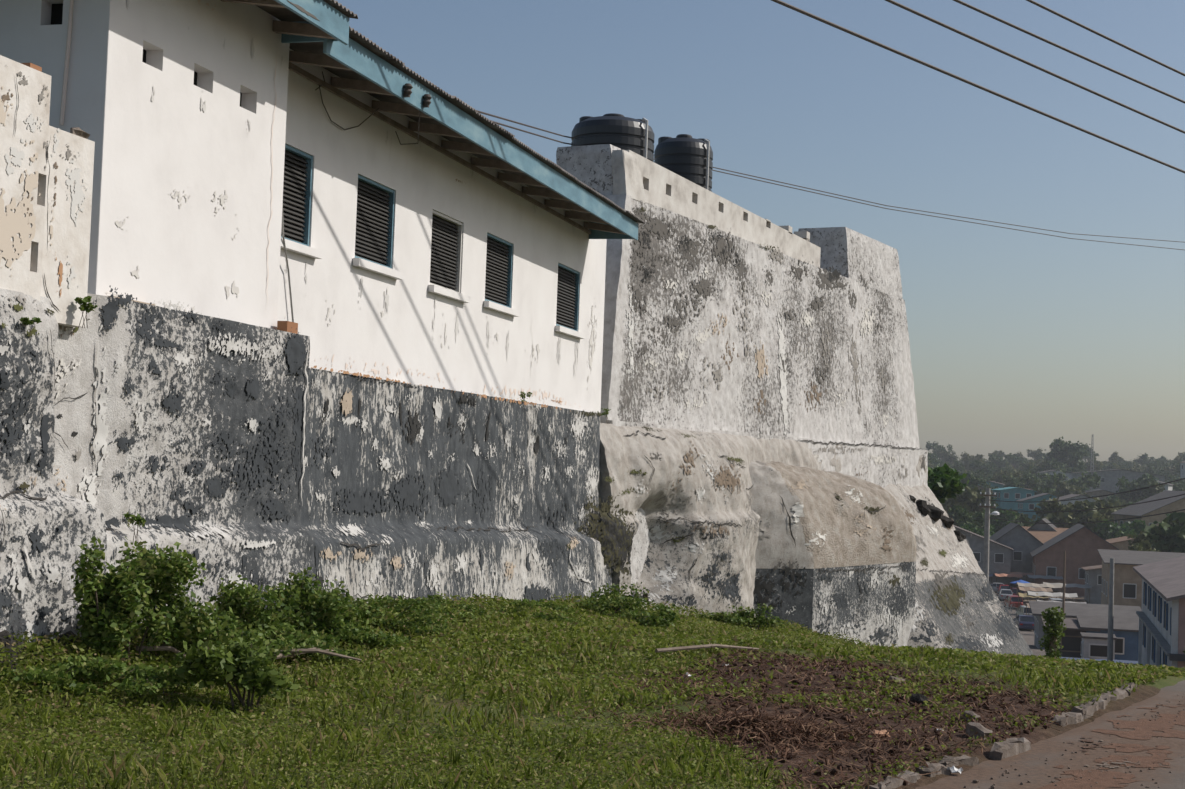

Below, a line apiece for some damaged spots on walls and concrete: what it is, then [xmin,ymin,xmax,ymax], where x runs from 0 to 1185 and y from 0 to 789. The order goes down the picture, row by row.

flaking render [0,114,60,277]
peeling [54,346,123,506]
damp [309,355,581,445]
damp [574,305,597,390]
damp [628,208,758,390]
damp [762,245,888,414]
peeling [314,508,471,600]